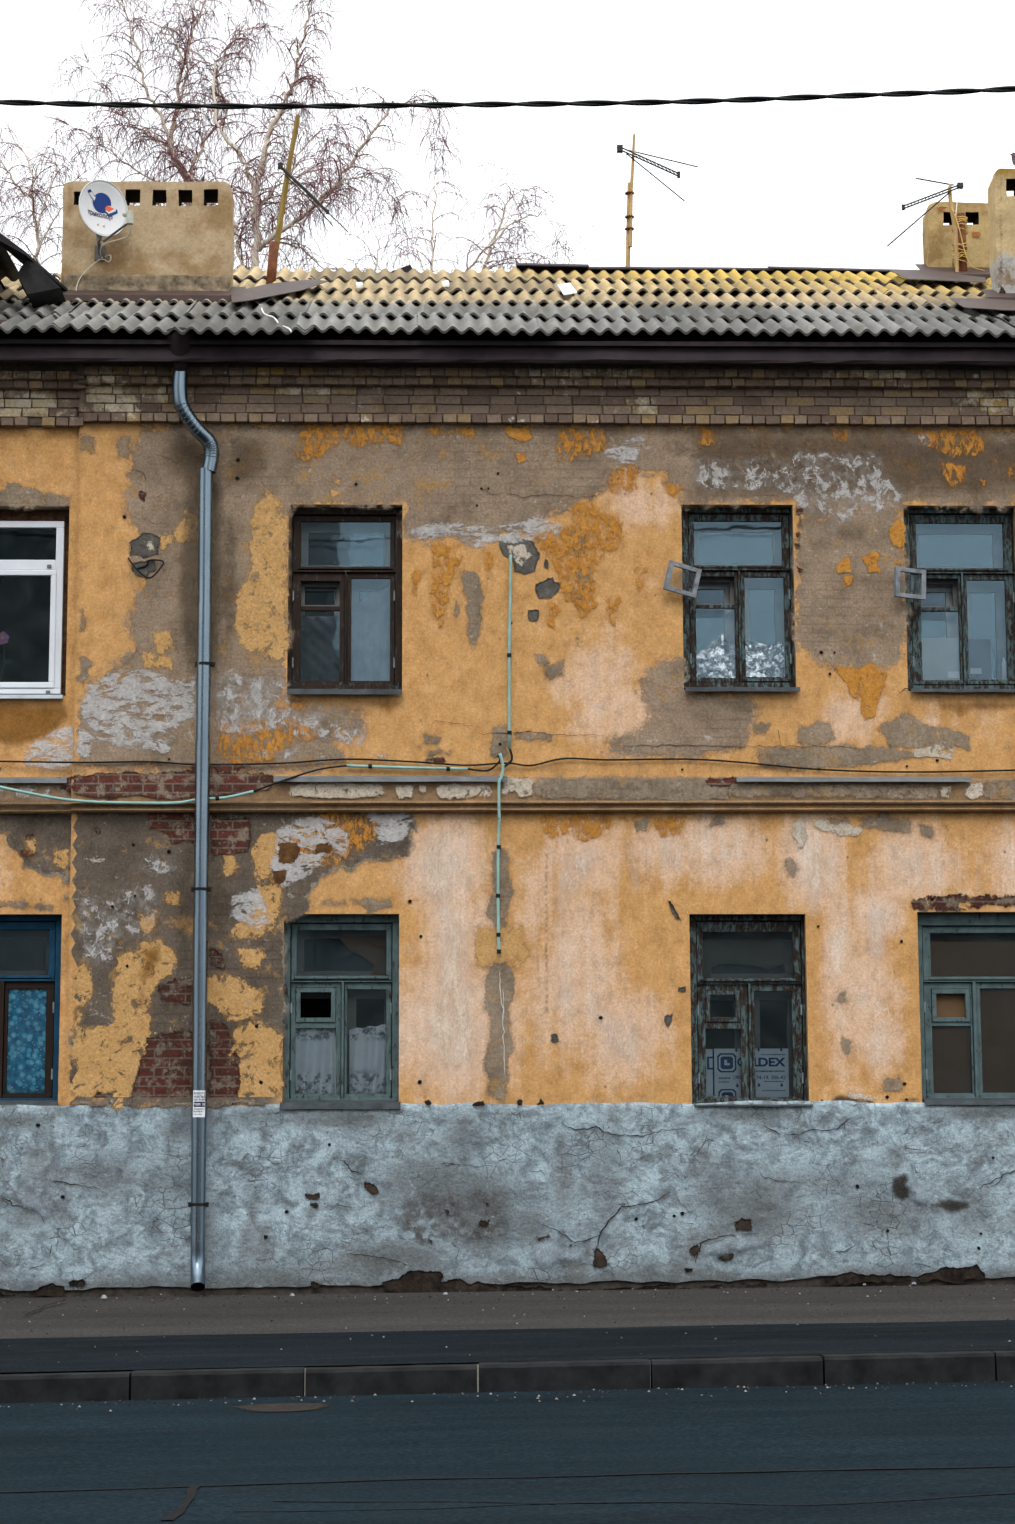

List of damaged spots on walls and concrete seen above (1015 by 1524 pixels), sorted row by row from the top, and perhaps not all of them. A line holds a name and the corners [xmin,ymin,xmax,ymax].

peeling [0,422,1015,1111]
crack [758,1118,848,1142]
crack [977,1170,1015,1190]
crack [695,1233,759,1263]